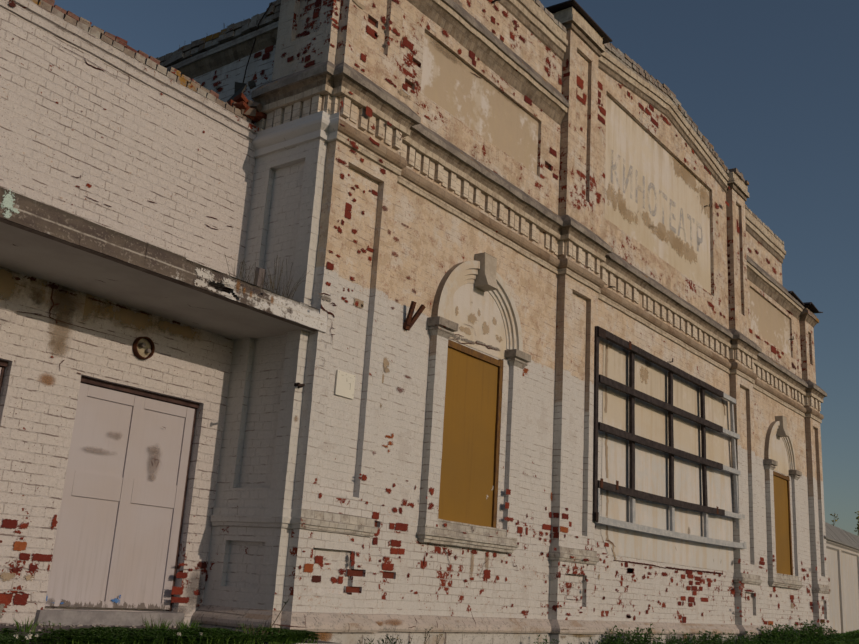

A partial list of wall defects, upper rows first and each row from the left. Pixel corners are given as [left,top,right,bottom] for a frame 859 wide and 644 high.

peeling [254,45,315,76]
peeling [353,0,419,100]
peeling [618,83,711,174]
peeling [1,188,20,219]
spalling [194,267,236,297]
water stain [36,281,199,354]
peeling [0,593,29,618]
peeling [0,518,53,581]
peeling [171,561,208,603]
peeling [299,499,414,593]
flaking render [539,491,723,616]
peeling [801,557,830,623]